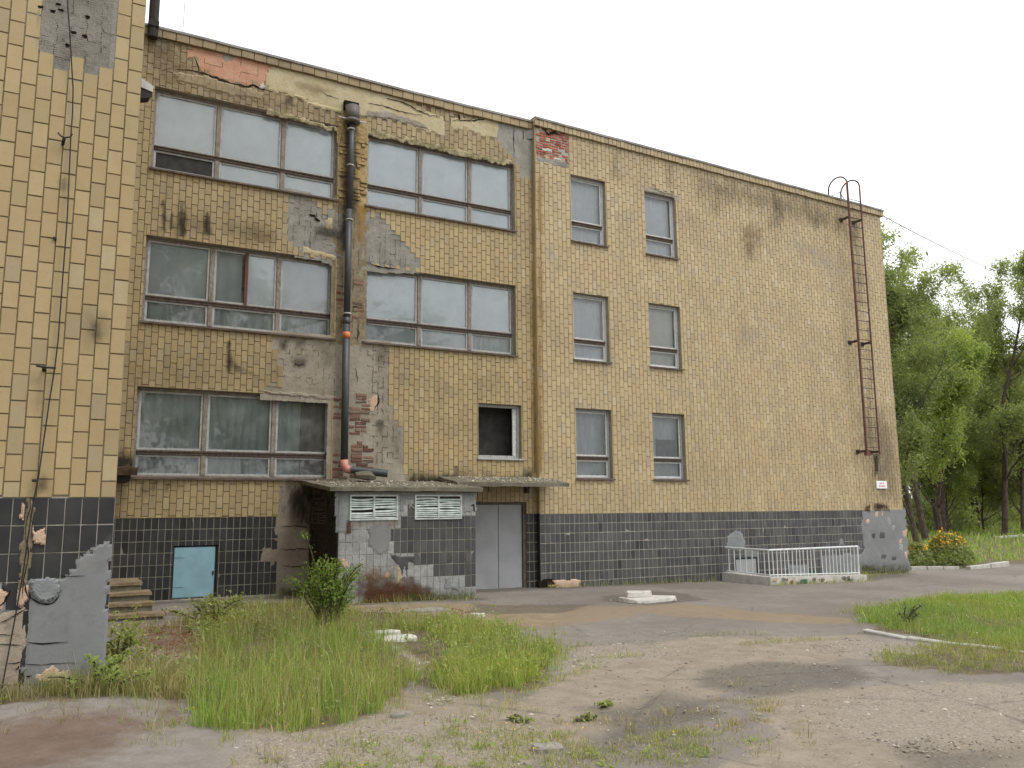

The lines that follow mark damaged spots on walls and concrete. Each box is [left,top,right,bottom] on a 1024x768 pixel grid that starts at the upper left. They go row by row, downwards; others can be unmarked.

flaking render [23,0,126,84]
crack [165,57,273,92]
spalling [186,47,569,596]
flaking render [861,508,910,574]
peeling [35,665,70,682]